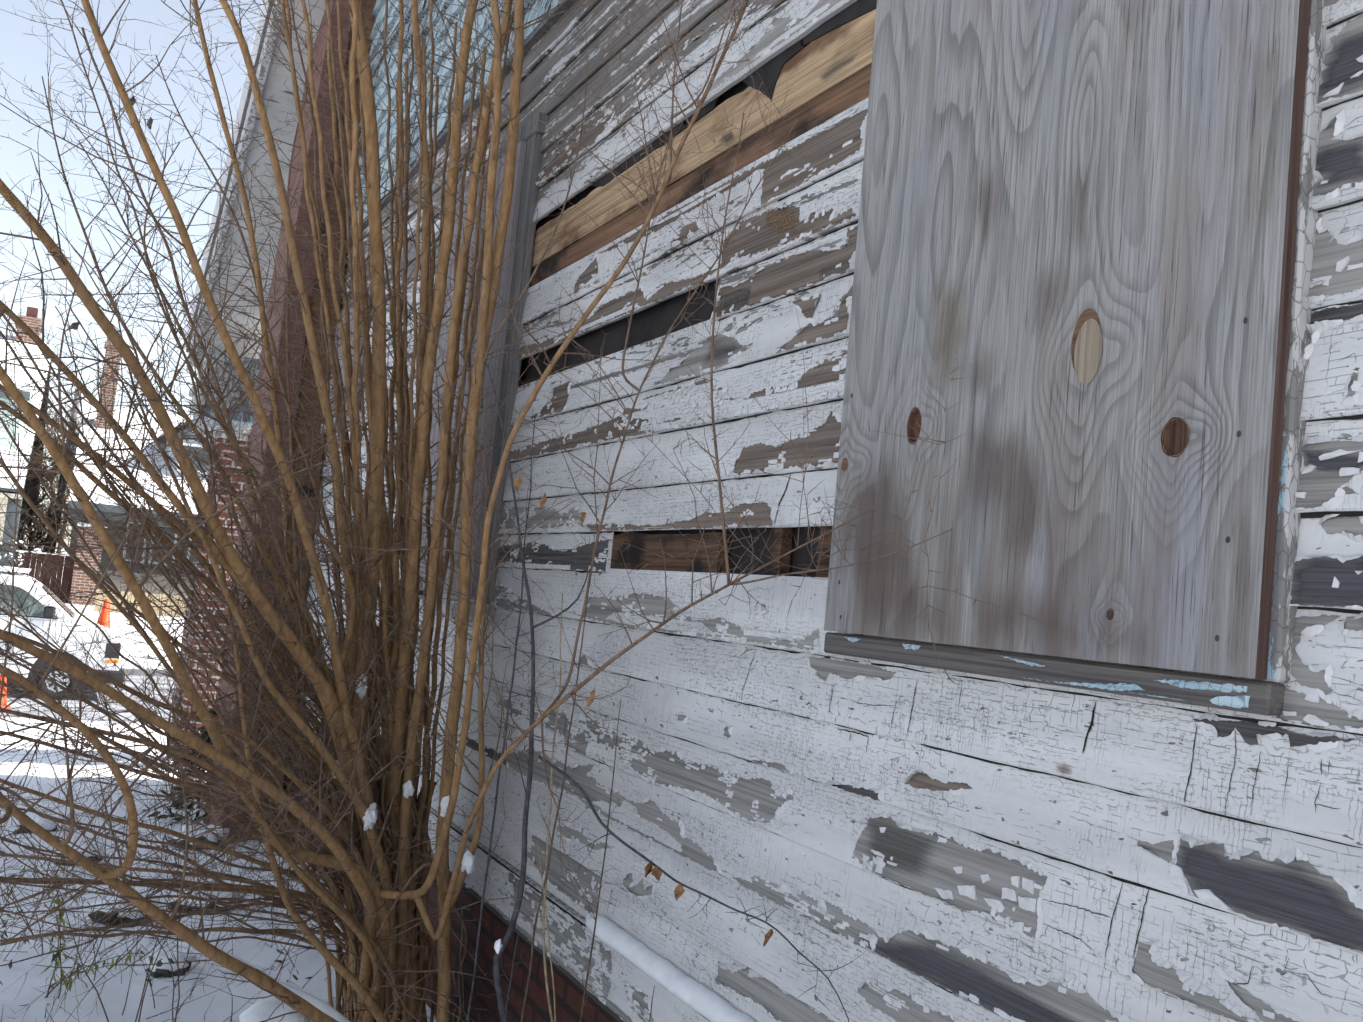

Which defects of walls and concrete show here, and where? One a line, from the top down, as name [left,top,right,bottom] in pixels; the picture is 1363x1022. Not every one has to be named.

peeling [535,0,842,185]
peeling [1303,14,1363,360]
peeling [507,107,868,476]
peeling [1341,372,1362,405]
peeling [495,498,779,572]
peeling [1001,433,1363,753]
crack [829,682,917,750]
crack [1082,702,1096,753]
crack [1184,726,1197,802]
crack [1225,731,1338,813]
peeling [465,696,1130,1022]
peeling [1110,831,1363,952]